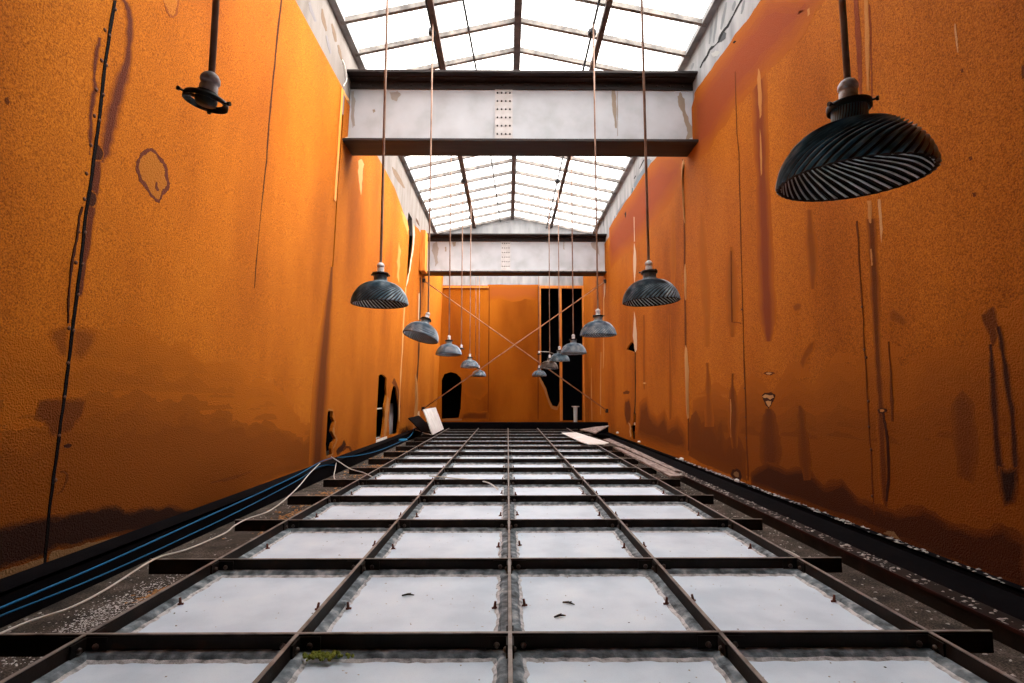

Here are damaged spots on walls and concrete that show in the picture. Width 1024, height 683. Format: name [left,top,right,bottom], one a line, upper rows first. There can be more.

damp [79,0,135,297]
damp [135,148,170,203]
damp [0,267,352,572]
spalling [762,392,775,409]
damp [623,213,1024,587]